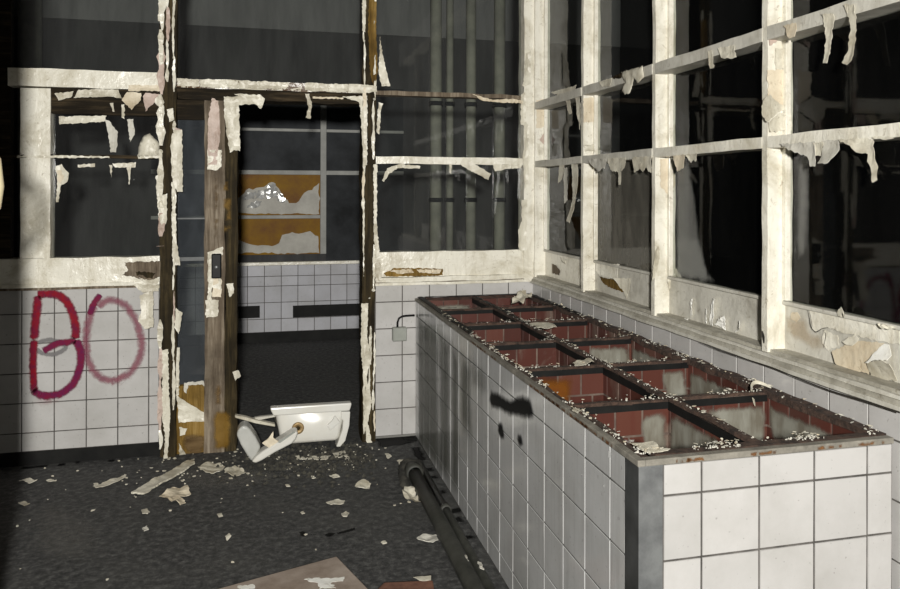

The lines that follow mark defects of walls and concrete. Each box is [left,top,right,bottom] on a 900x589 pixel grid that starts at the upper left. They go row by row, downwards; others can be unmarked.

peeling [822,13,835,63]
peeling [841,4,857,65]
peeling [558,144,697,223]
peeling [781,136,894,183]
peeling [17,0,282,459]
peeling [305,0,443,443]
peeling [652,246,660,281]
leakage [419,322,470,474]
peeling [444,299,732,454]
peeling [705,298,740,333]
peeling [791,307,900,381]
peeling [692,438,741,450]